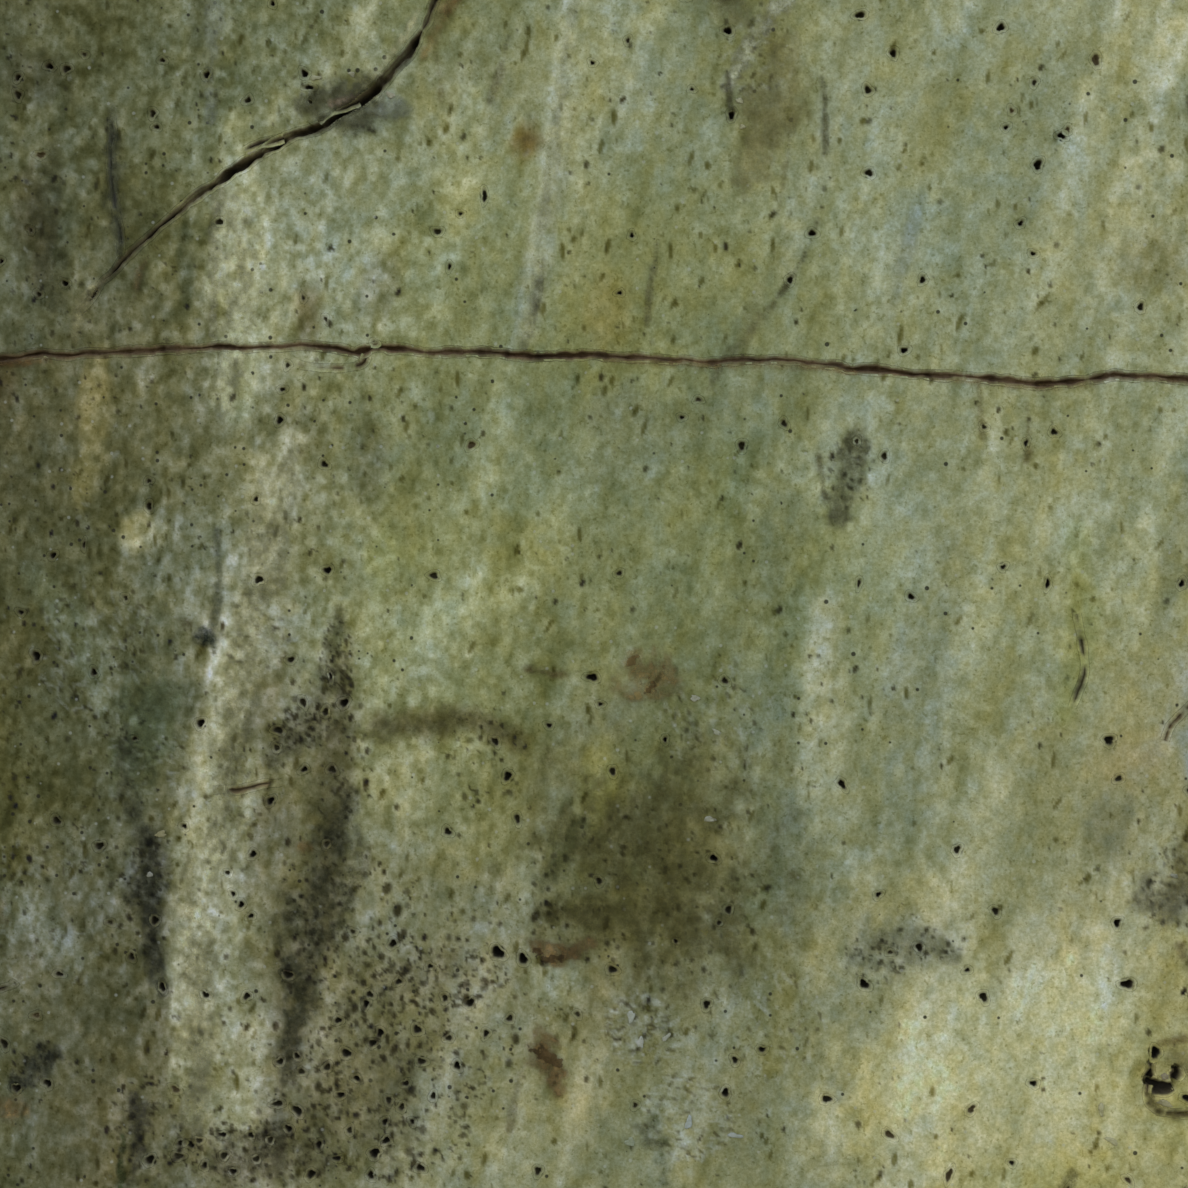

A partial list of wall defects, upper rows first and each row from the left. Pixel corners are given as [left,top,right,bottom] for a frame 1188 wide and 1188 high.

crack [0,0,1188,391]
water stain [824,431,868,524]
rust [616,648,679,701]
water stain [319,789,358,856]
water stain [537,773,747,982]
water stain [278,868,353,1086]
rust [527,1030,567,1097]